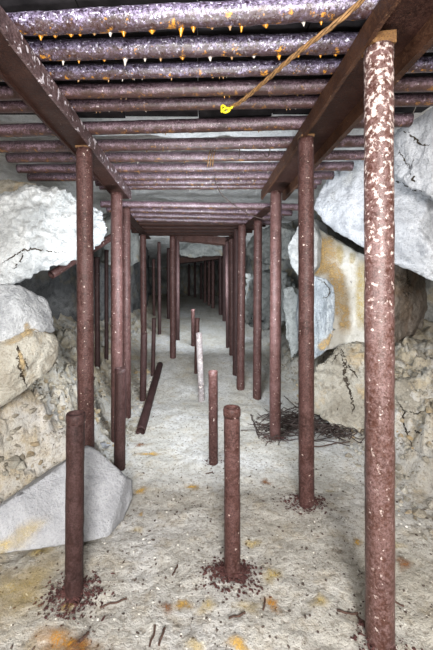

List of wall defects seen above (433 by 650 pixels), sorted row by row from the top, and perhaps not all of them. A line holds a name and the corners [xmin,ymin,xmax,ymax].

rust [271,491,335,515]
rust [21,564,115,650]
rust [195,552,279,609]